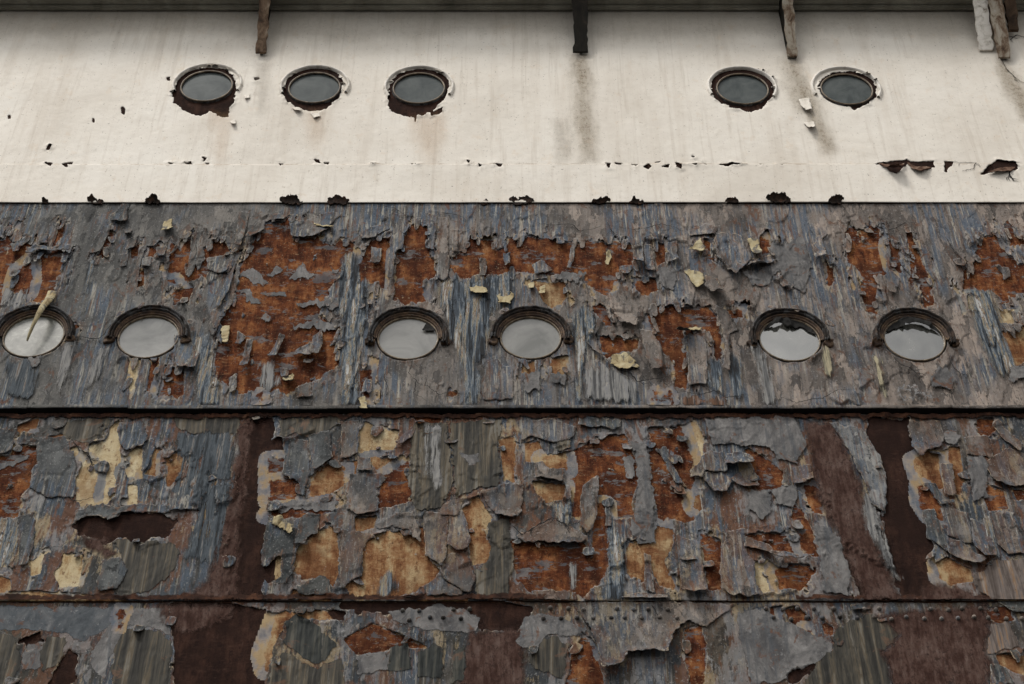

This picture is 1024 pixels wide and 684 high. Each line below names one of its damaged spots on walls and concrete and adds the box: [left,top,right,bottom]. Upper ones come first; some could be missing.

corrosion [170,64,236,117]
corrosion [387,69,449,117]
peeling [187,211,341,392]
peeling [667,223,776,370]
peeling [3,512,128,596]
peeling [29,418,205,521]
peeling [261,396,483,596]
corrosion [0,193,1024,684]
peeling [517,475,612,543]
peeling [532,528,814,667]
peeling [655,419,760,491]
peeling [829,422,887,511]